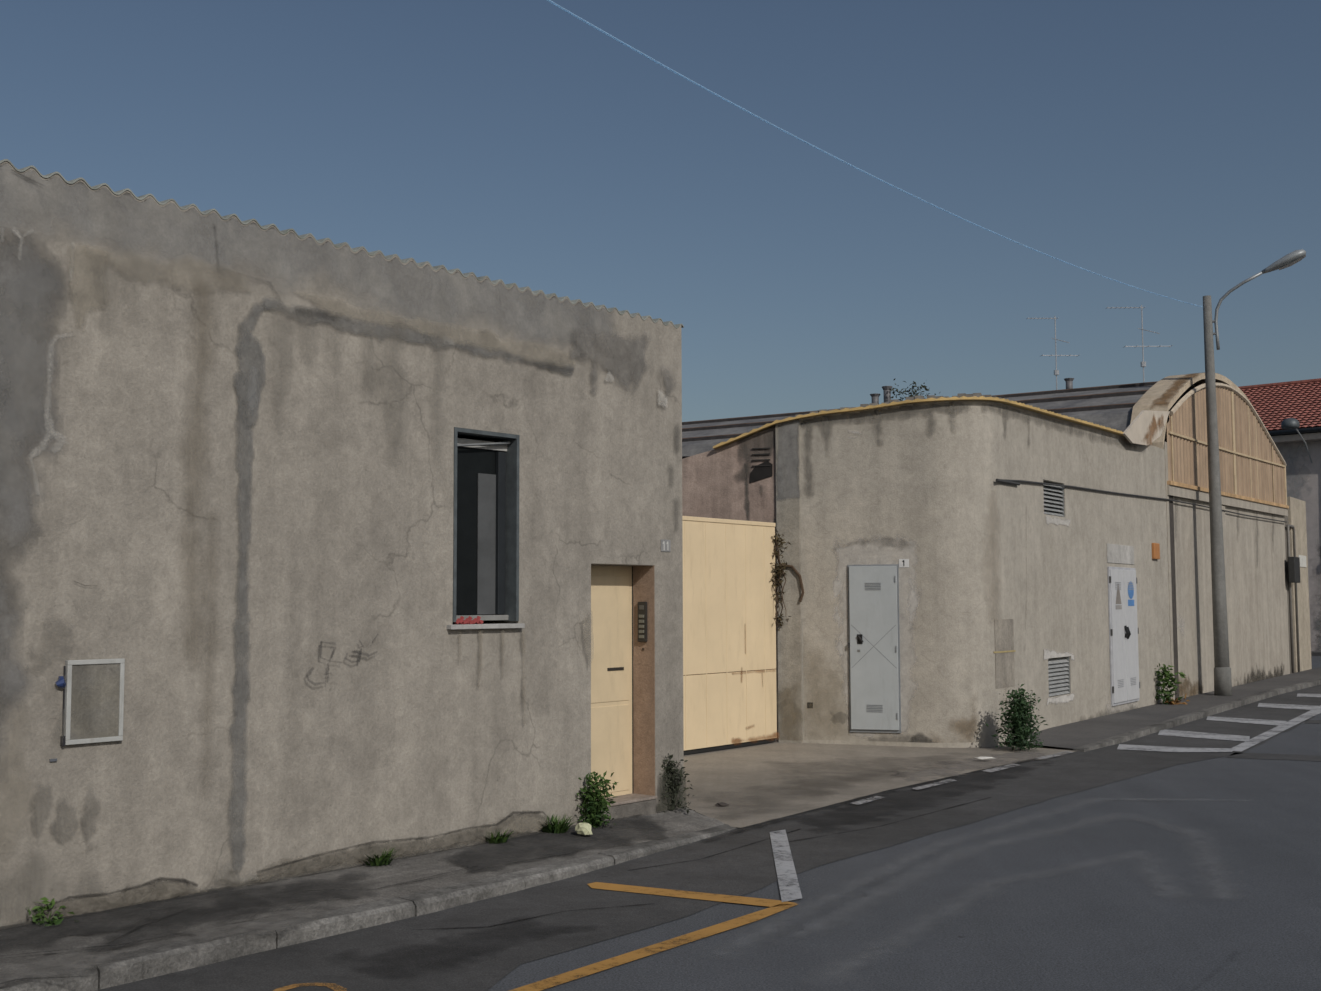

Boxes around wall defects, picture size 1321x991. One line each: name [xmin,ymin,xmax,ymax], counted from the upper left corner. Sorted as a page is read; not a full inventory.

damp [0,237,61,716]
damp [571,330,647,391]